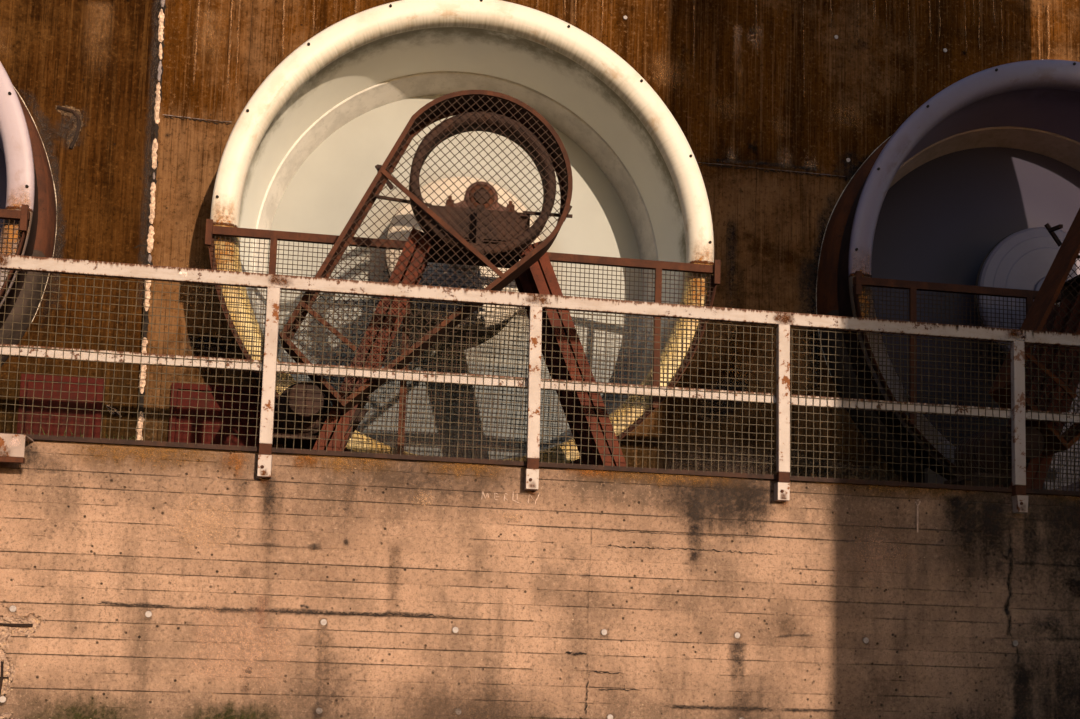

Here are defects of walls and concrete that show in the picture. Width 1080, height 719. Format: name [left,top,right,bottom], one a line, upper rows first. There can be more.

corrosion [0,196,33,265]
corrosion [212,210,237,271]
corrosion [688,251,714,309]
damp [676,457,767,560]
crack [1002,533,1080,663]
spalling [0,612,45,696]